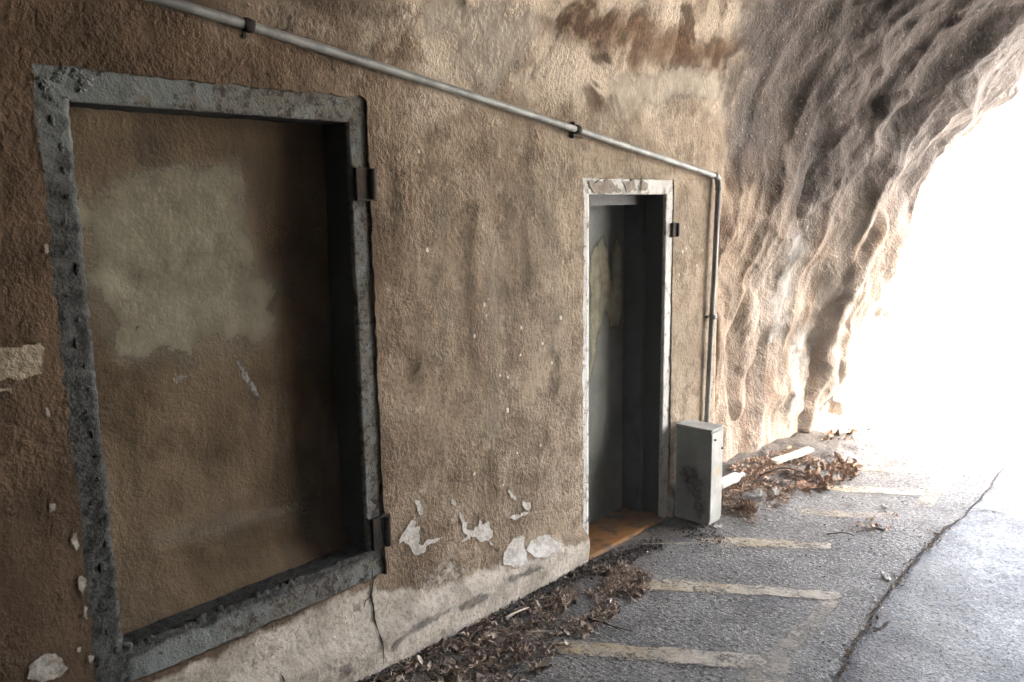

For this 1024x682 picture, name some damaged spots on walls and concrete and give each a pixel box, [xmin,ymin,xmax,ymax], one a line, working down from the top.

peeling [0,342,45,394]
peeling [399,499,444,555]
peeling [451,499,564,569]
peeling [508,490,531,520]
crack [364,569,384,665]
peeling [27,653,68,682]